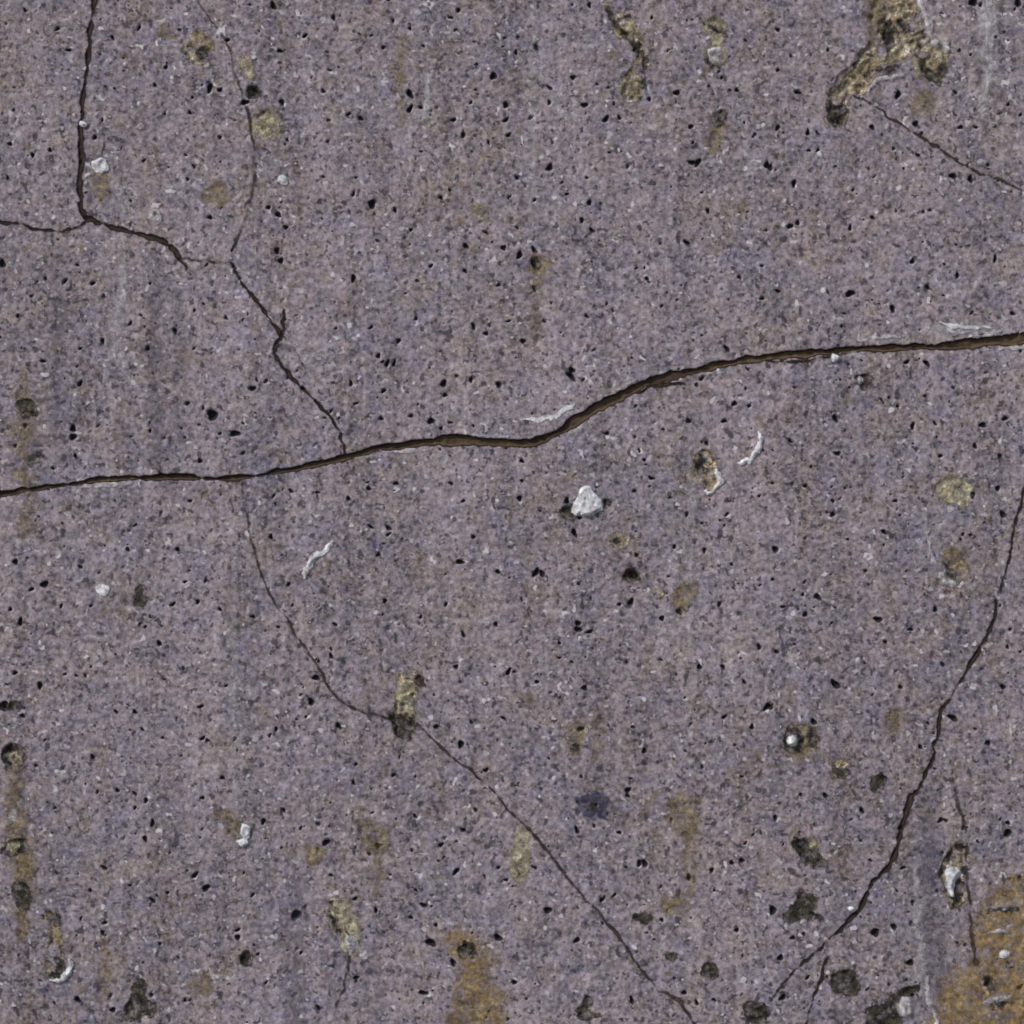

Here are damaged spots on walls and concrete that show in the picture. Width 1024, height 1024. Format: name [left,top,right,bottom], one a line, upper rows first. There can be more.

crack [0,0,1024,498]
crack [246,512,695,1024]
crack [762,487,1024,1024]